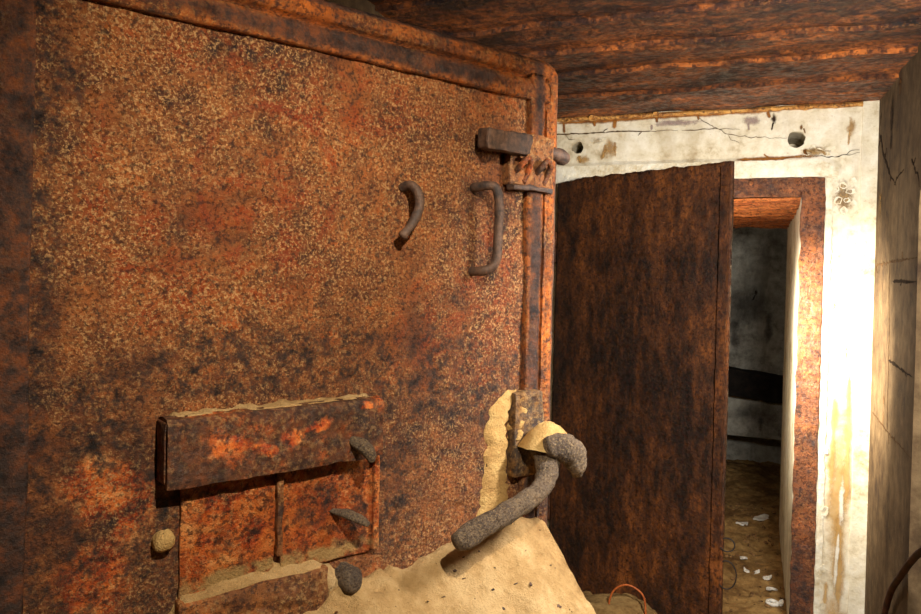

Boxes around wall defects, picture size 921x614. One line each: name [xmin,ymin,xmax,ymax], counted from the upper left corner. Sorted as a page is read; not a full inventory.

crack [557,121,772,143]